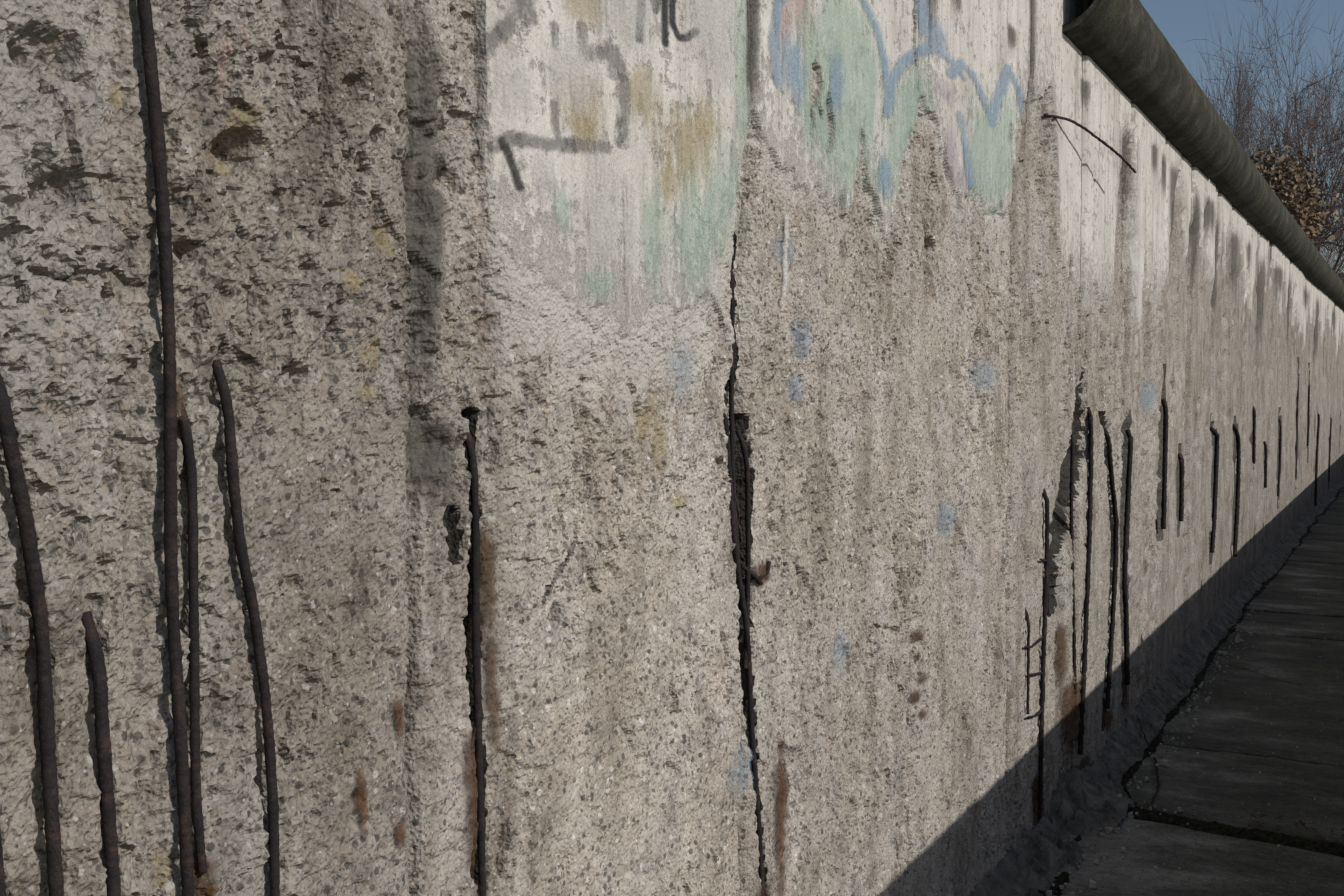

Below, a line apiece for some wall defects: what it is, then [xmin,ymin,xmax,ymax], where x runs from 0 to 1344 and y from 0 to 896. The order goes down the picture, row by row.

spalling [0,0,182,896]
spalling [150,0,423,896]
spalling [401,0,1344,896]
rust [468,530,501,744]
rust [1055,623,1082,749]
rust [465,732,486,872]
rust [761,738,790,896]